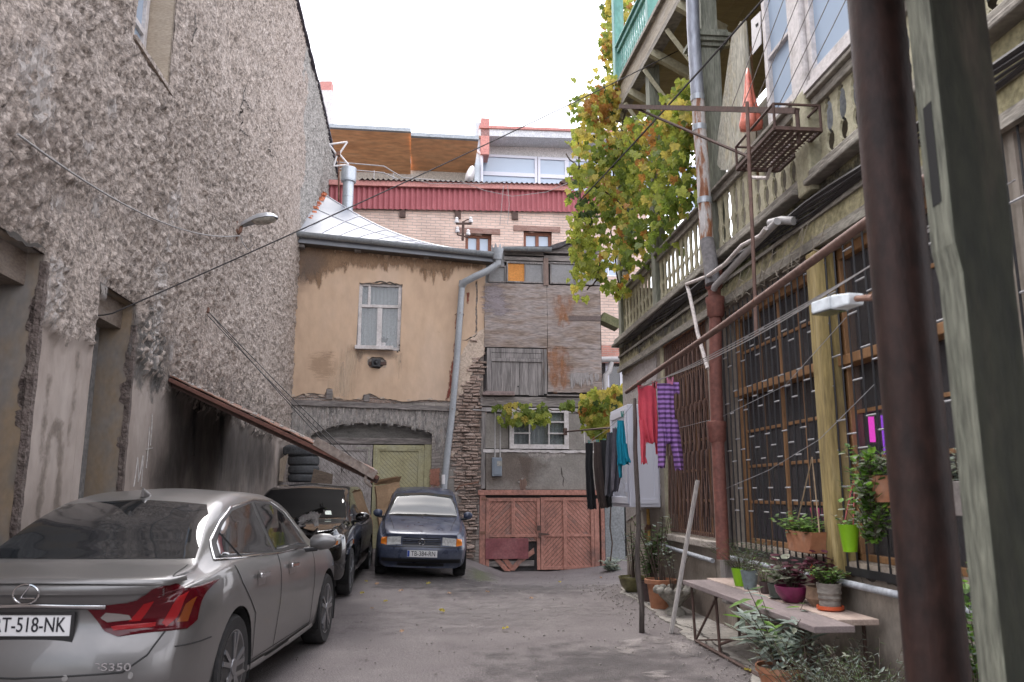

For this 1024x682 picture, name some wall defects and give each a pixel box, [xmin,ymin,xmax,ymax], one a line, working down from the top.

leakage [299,247,480,288]
spalling [9,261,50,539]
spalling [116,325,138,492]